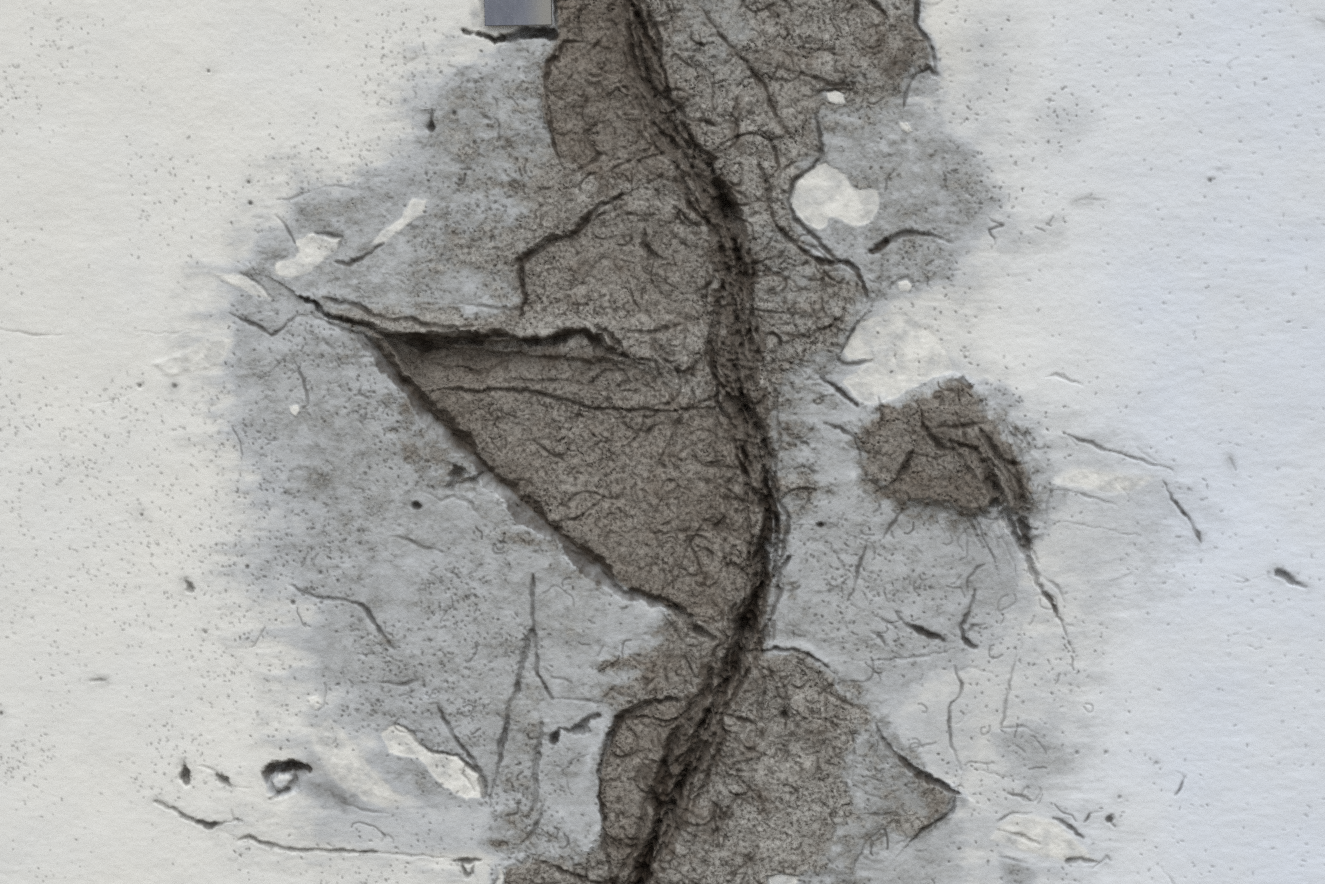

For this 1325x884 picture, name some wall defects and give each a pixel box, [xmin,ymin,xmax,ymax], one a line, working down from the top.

peeling [217,275,268,299]
peeling [275,234,340,279]
spalling [327,0,717,407]
spalling [656,0,954,406]
crack [154,0,1202,884]
peeling [308,697,393,795]
peeling [382,726,482,799]
spalling [496,667,671,884]
spalling [650,610,705,687]
spalling [668,652,956,884]